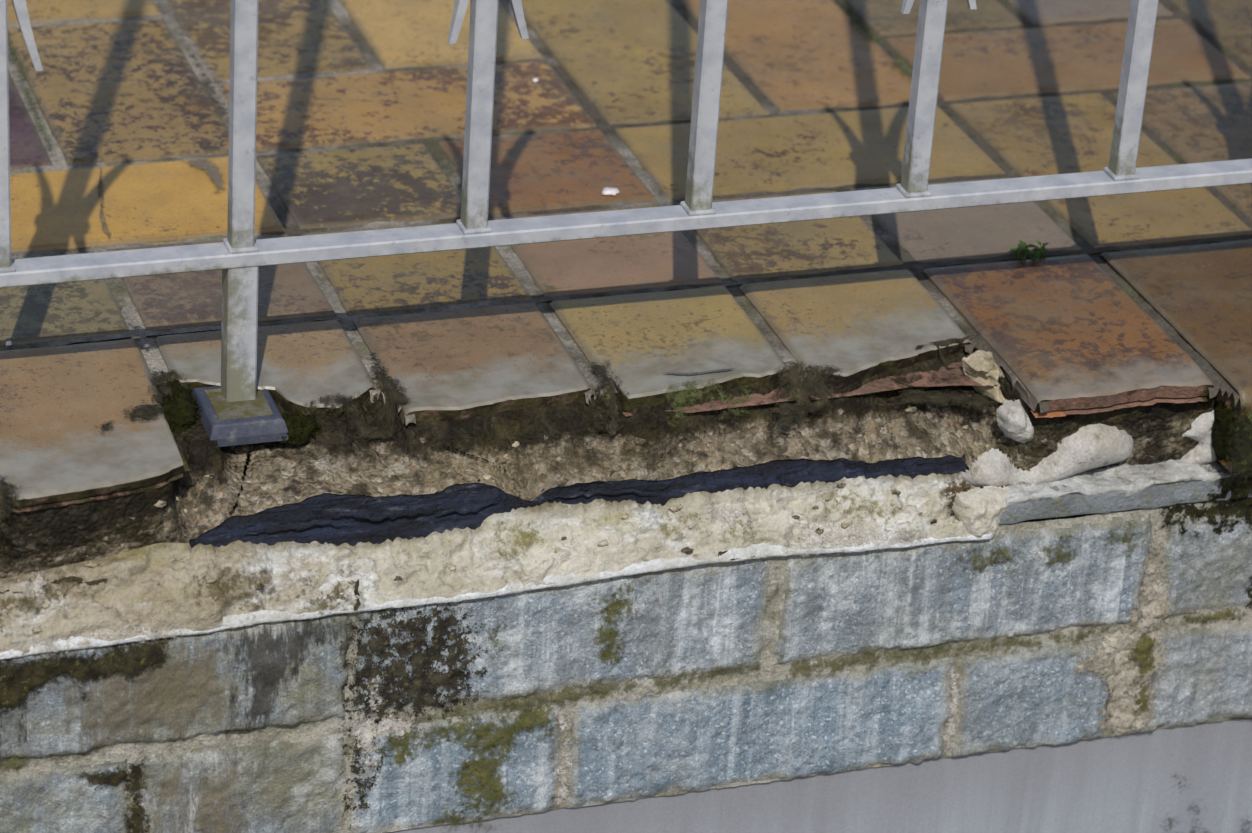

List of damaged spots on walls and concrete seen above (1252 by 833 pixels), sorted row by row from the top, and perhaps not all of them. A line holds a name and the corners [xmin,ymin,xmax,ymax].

crack [98,165,111,239]
spalling [0,347,1219,653]
damp [0,520,992,756]
damp [81,757,247,833]
damp [341,675,415,775]
damp [552,711,575,805]